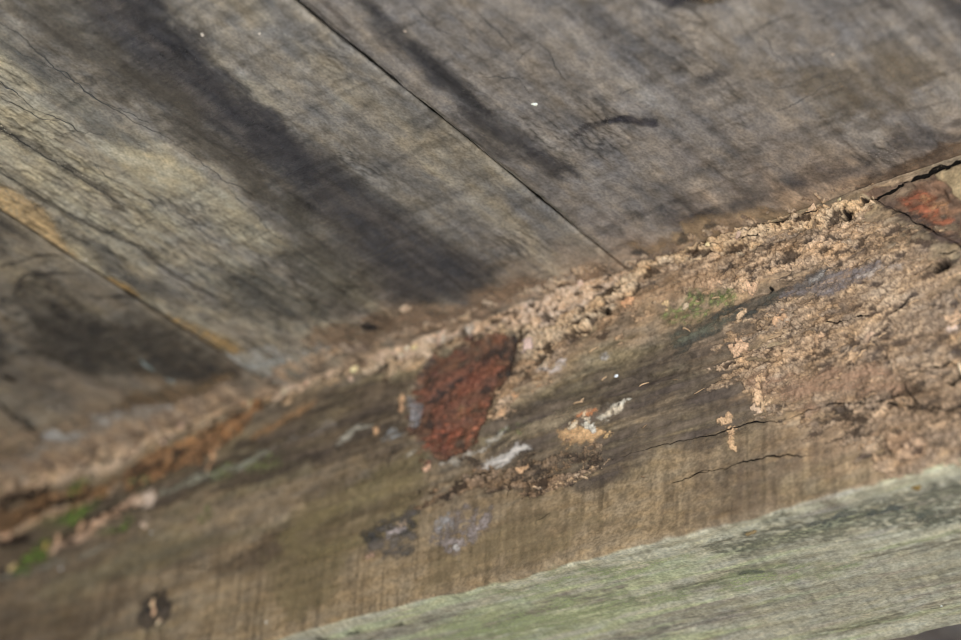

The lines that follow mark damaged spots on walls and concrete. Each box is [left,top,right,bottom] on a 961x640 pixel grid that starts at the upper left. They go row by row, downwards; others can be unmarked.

leakage [0,0,578,483]
crack [624,362,961,457]
crack [674,454,810,483]